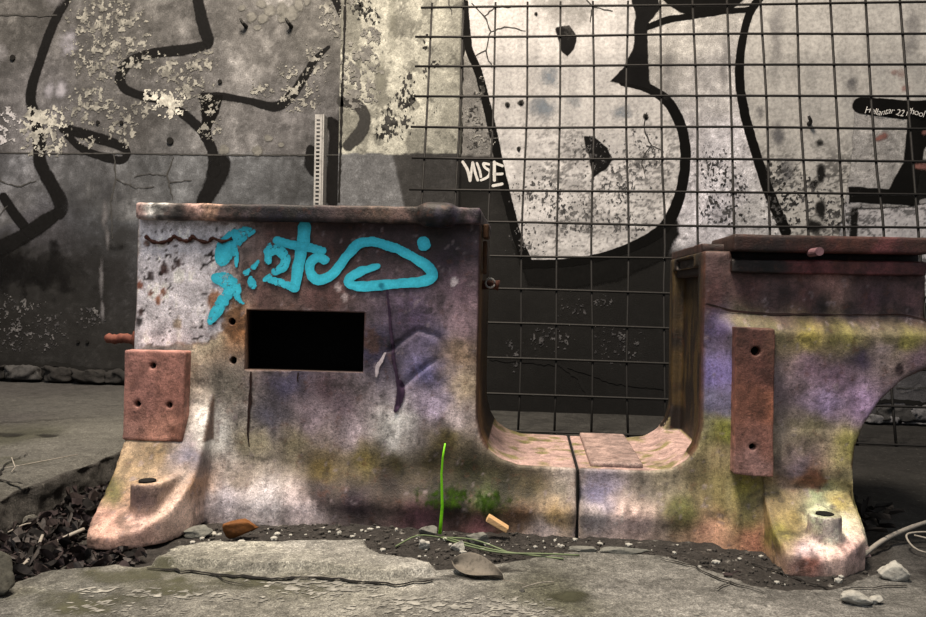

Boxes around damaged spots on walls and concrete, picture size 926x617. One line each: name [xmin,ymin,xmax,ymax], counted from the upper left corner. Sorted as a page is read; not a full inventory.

peeling [0,0,229,157]